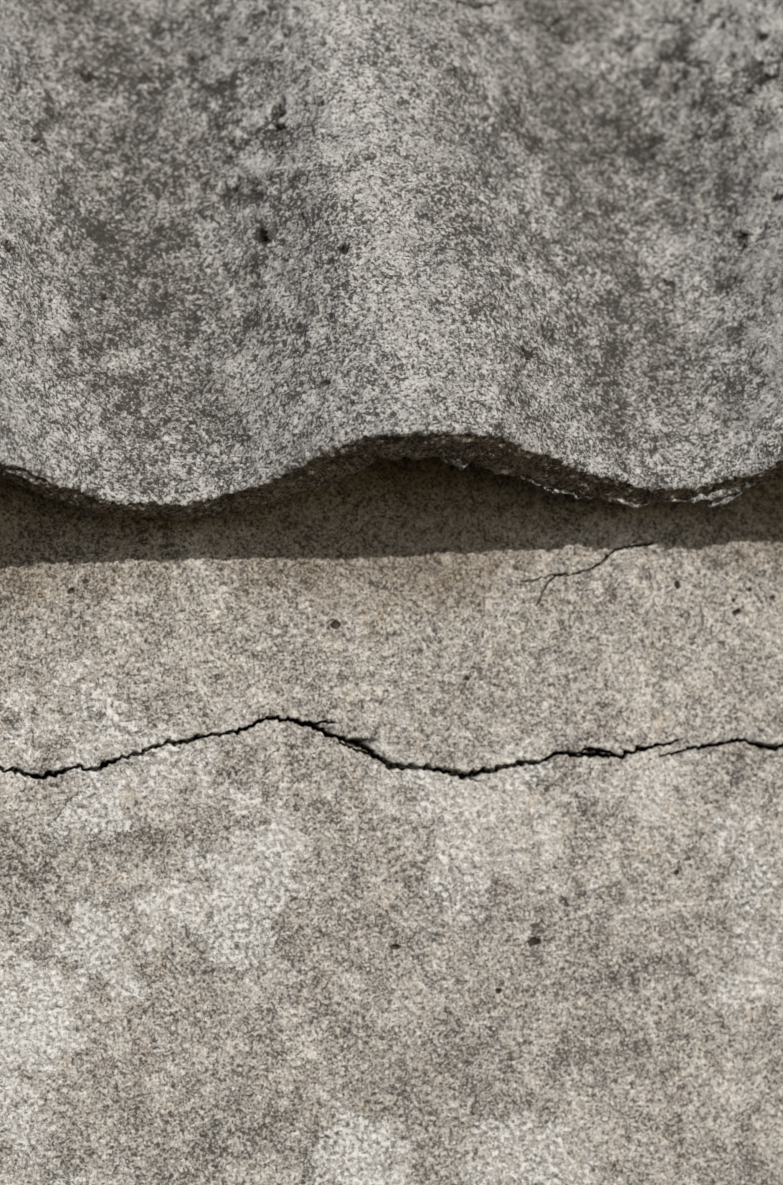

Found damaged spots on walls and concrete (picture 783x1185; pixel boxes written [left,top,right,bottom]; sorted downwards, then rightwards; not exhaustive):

crack [521,542,653,606]
crack [0,715,783,826]